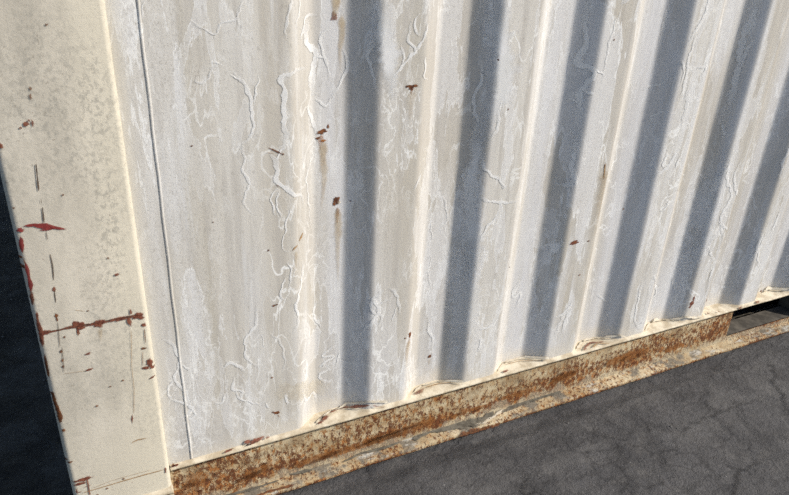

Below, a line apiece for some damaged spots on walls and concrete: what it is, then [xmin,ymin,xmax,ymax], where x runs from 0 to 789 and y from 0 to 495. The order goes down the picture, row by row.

corrosion [331,0,344,30]
corrosion [316,124,329,159]
corrosion [607,348,649,366]
corrosion [451,404,490,418]
corrosion [177,461,276,495]